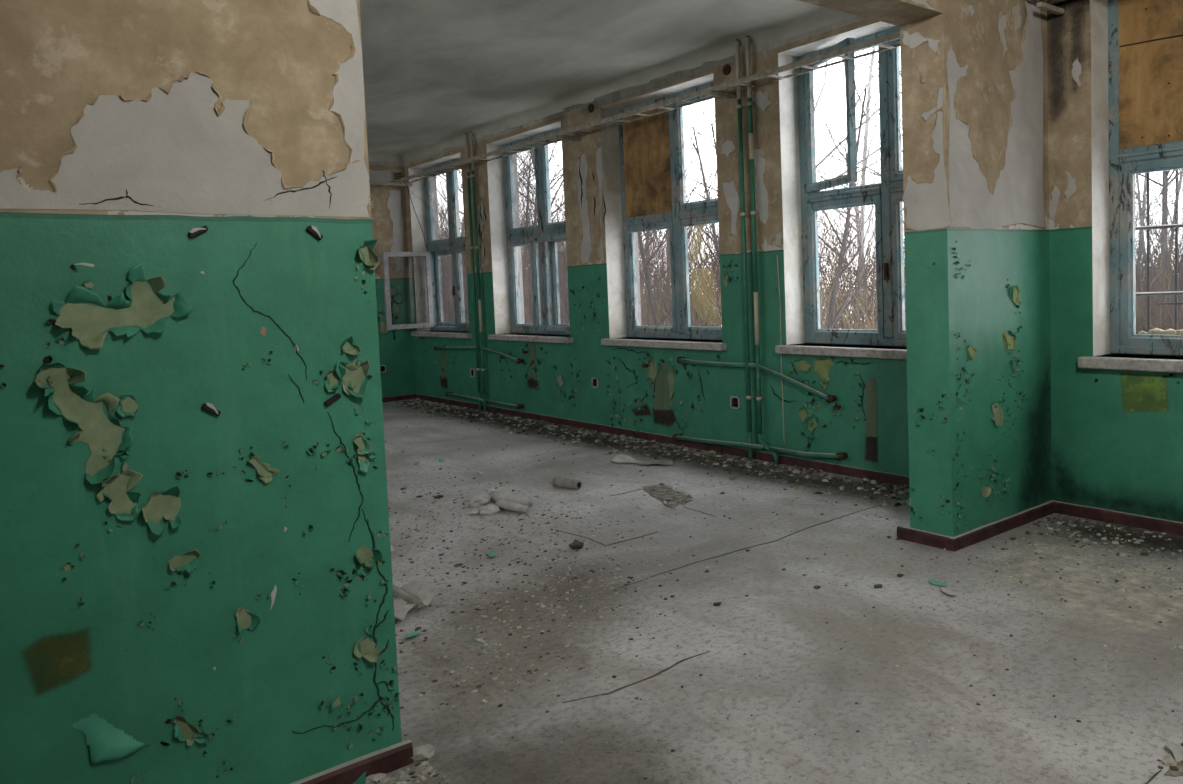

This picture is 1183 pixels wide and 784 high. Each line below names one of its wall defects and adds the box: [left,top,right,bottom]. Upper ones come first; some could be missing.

peeling [0,0,405,334]
peeling [722,179,740,236]
peeling [754,148,770,224]
peeling [901,0,1077,230]
peeling [34,262,193,536]
peeling [307,334,378,474]
peeling [789,357,866,450]
peeling [990,279,1028,445]
crack [233,243,394,734]
peeling [330,530,389,598]
peeling [145,698,236,756]
peeling [320,595,401,749]